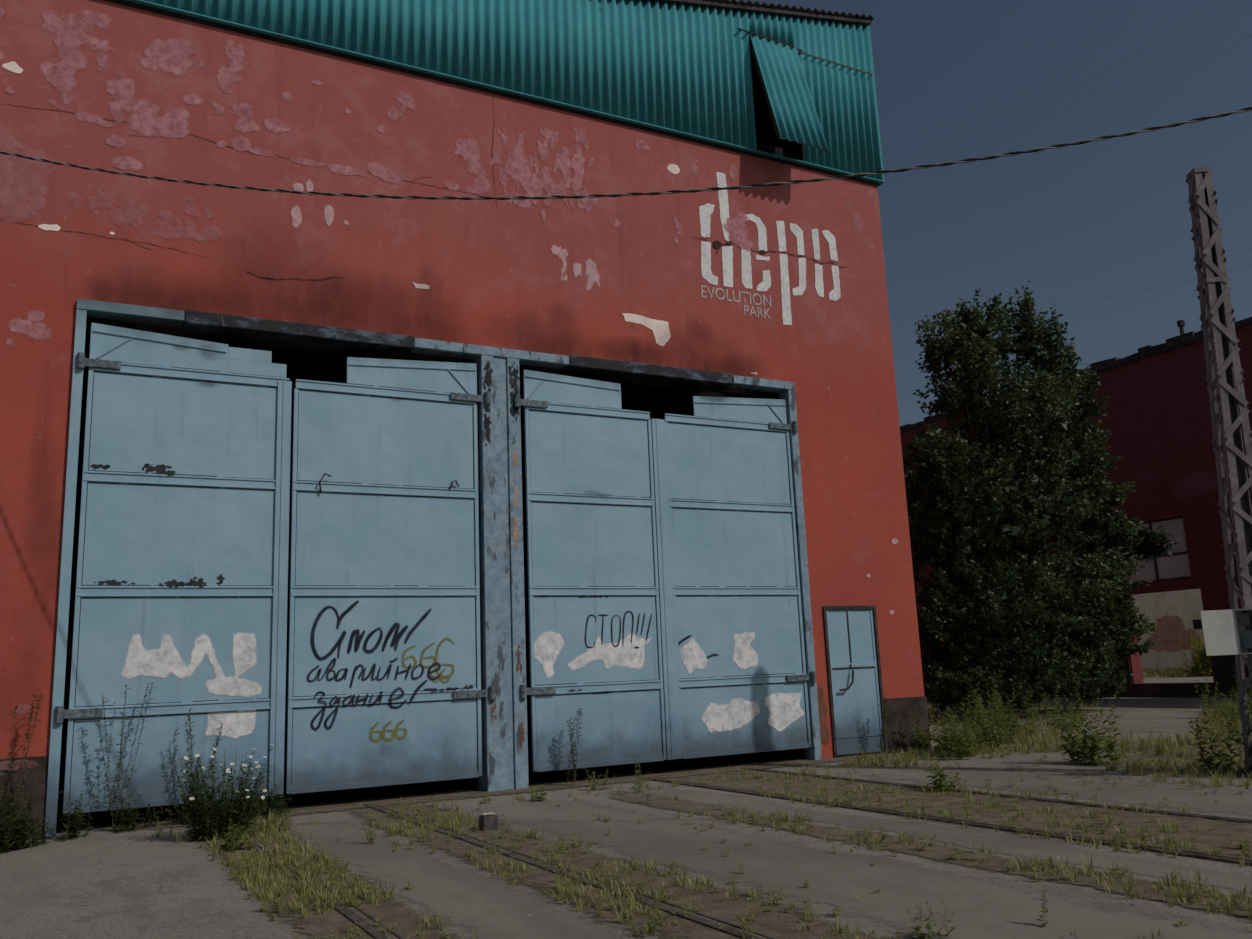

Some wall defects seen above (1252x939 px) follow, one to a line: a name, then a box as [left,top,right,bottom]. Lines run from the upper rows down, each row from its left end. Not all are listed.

spalling [0,51,23,74]
peeling [40,10,290,170]
crack [0,103,155,137]
crack [403,97,497,204]
peeling [444,117,599,221]
crack [0,219,203,257]
peeling [6,310,52,345]